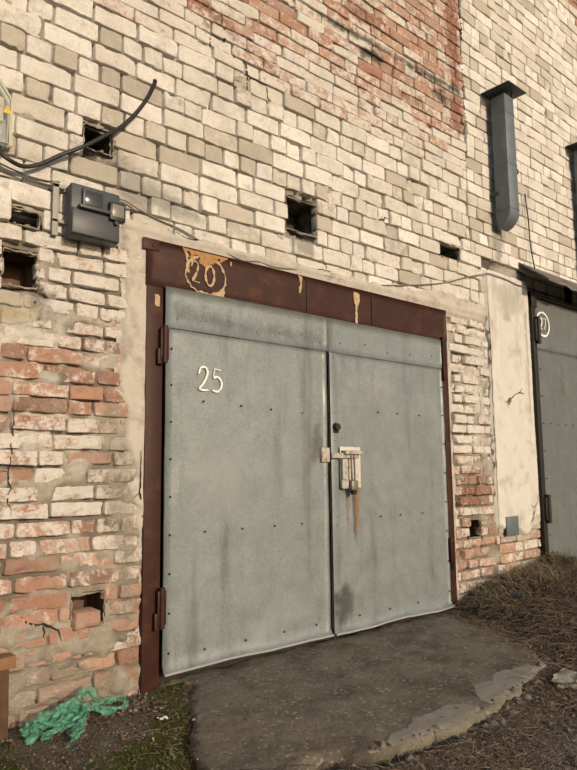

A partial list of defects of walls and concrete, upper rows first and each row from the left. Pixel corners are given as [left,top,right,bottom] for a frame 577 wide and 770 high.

peeling [183,247,232,297]
crack [1,403,23,517]
peeling [455,468,492,539]